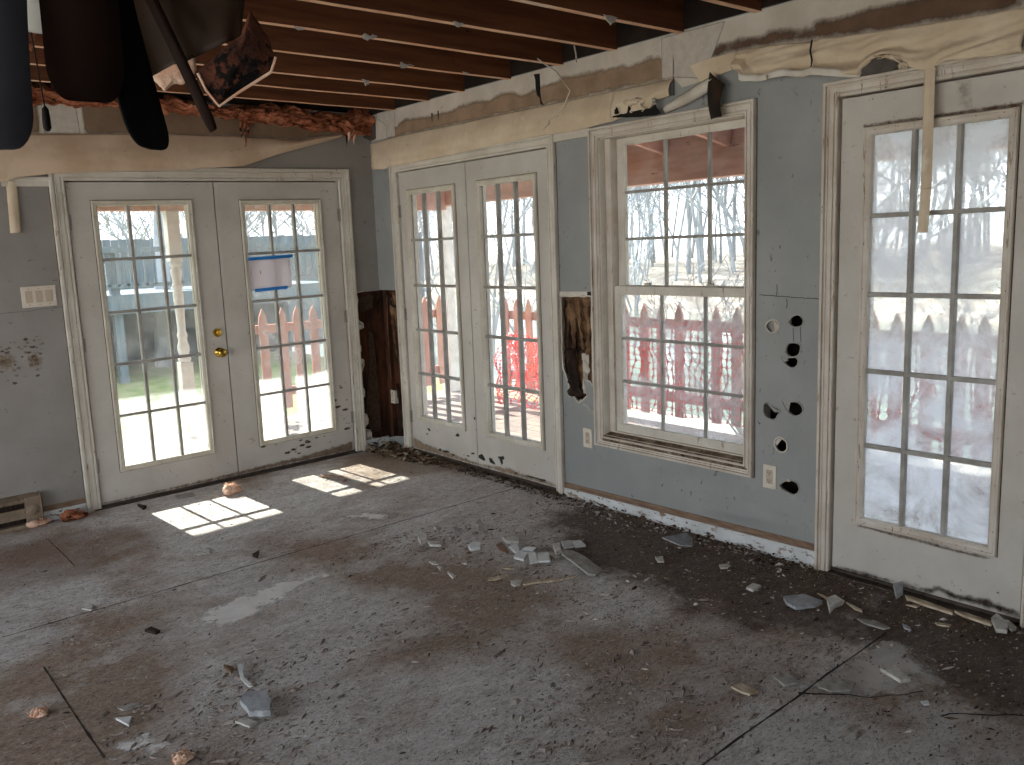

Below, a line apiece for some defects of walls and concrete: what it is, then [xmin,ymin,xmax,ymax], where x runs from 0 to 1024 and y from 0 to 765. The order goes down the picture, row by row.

flaking render [31,104,45,133]
flaking render [62,107,129,134]
flaking render [360,0,1024,142]
spalling [357,290,404,439]
spalling [559,292,594,416]